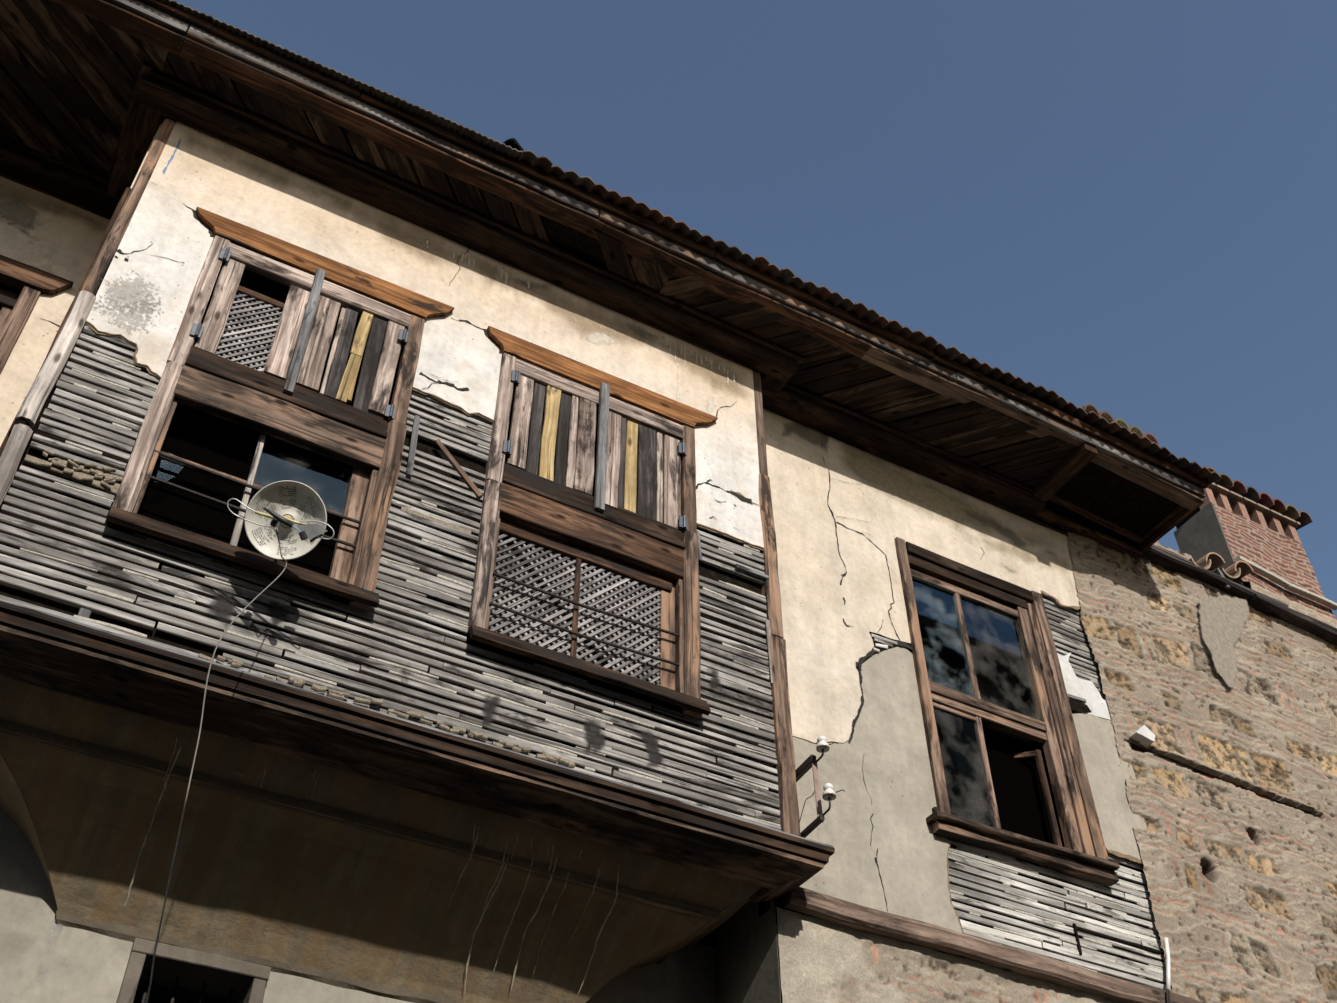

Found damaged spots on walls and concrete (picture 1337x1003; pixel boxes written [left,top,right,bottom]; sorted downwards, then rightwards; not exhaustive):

water stain [0,194,63,231]
crack [183,203,214,237]
crack [115,243,184,263]
crack [420,372,469,391]
crack [696,479,758,530]
flaking render [0,320,781,831]
flaking render [865,632,913,660]
crack [822,456,913,911]